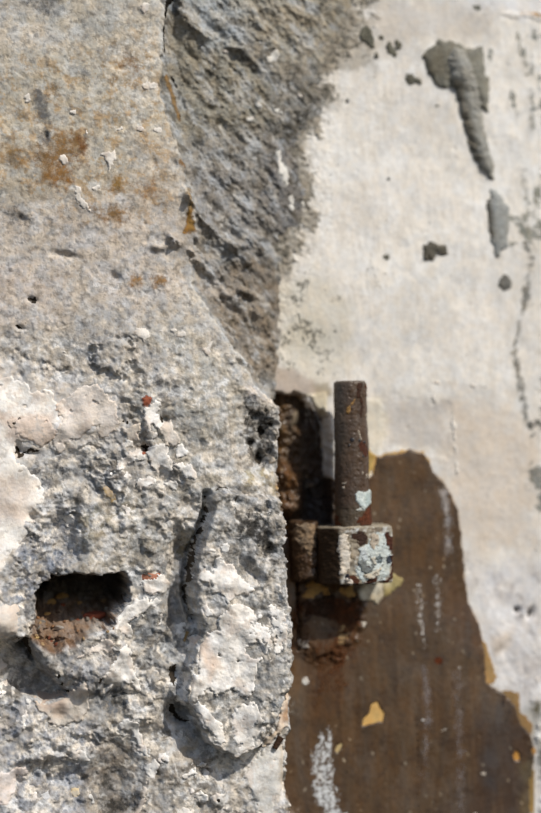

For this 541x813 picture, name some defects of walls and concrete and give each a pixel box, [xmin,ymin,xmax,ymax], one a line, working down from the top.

crack [163,0,174,52]
peeling [165,75,181,121]
rust [356,383,367,417]
crack [181,486,237,620]
rust [350,504,372,547]
peeling [77,573,170,692]
rust [290,532,394,691]
peeling [174,393,537,813]
peeling [0,656,9,699]
peeling [20,673,90,730]